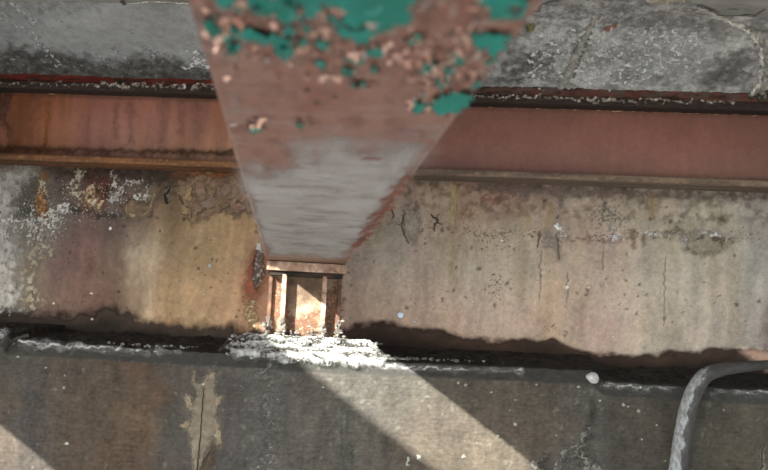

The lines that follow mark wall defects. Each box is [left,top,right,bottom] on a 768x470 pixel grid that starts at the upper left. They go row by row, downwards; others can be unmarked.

leakage [144,47,209,70]
peeling [200,0,768,118]
peeling [230,117,279,138]
rust [34,168,49,218]
peeling [176,140,425,259]
rust [244,243,345,336]
leakage [0,166,768,470]
peeling [180,370,224,470]
crack [196,387,215,470]